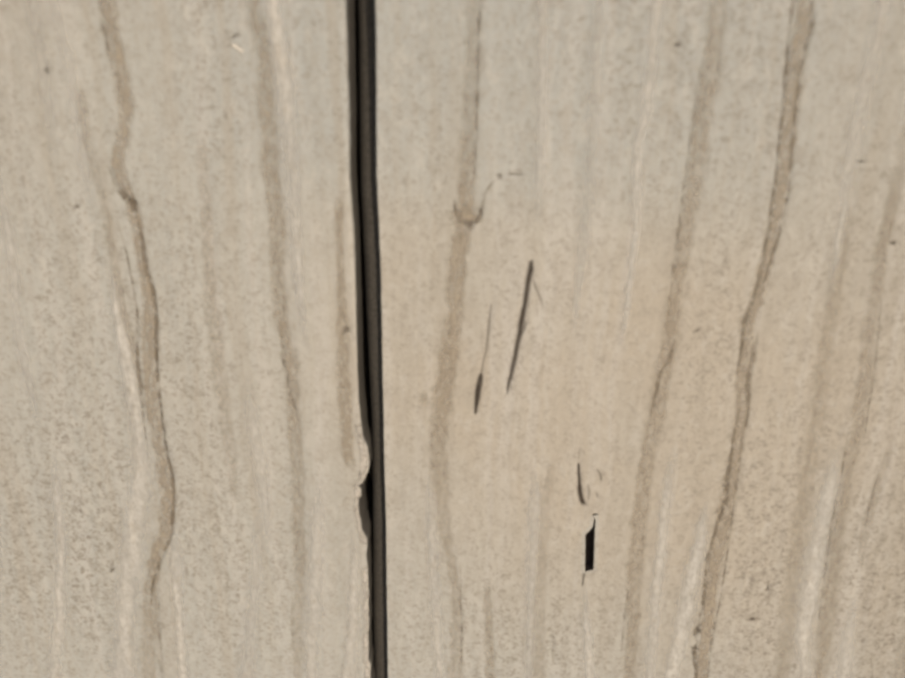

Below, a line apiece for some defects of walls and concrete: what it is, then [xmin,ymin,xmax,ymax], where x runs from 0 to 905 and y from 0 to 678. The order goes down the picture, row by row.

crack [507,262,533,392]
crack [474,375,482,414]
crack [577,463,585,504]